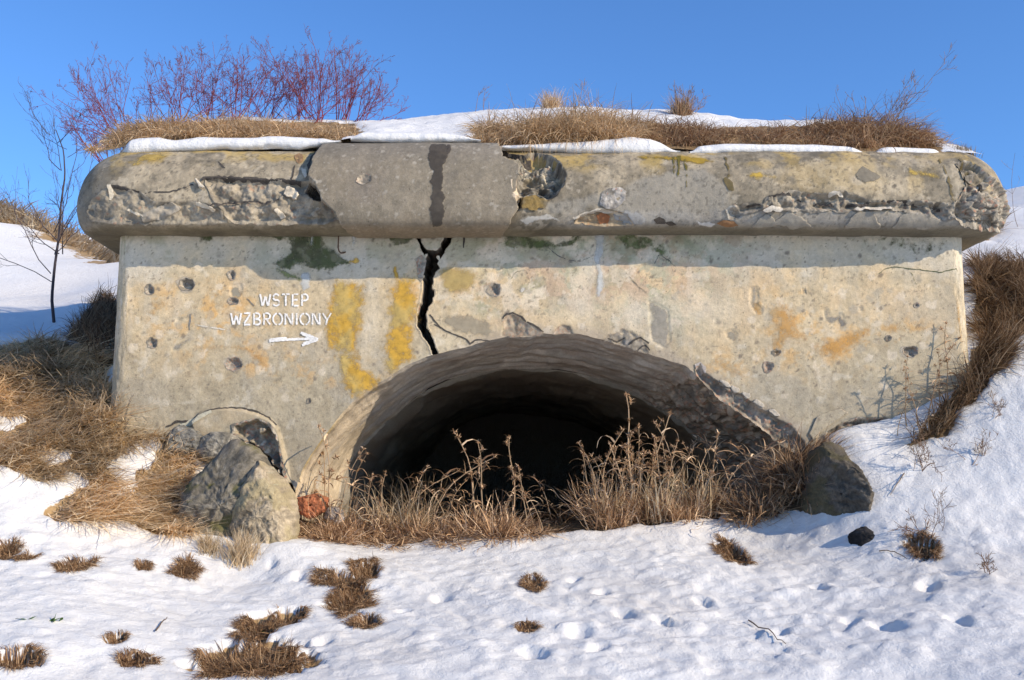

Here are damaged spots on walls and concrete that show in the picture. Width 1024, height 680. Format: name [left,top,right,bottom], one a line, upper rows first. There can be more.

spalling [86,162,338,227]
damp [428,144,451,227]
spalling [510,152,567,225]
spalling [698,160,1011,233]
crack [414,237,490,355]